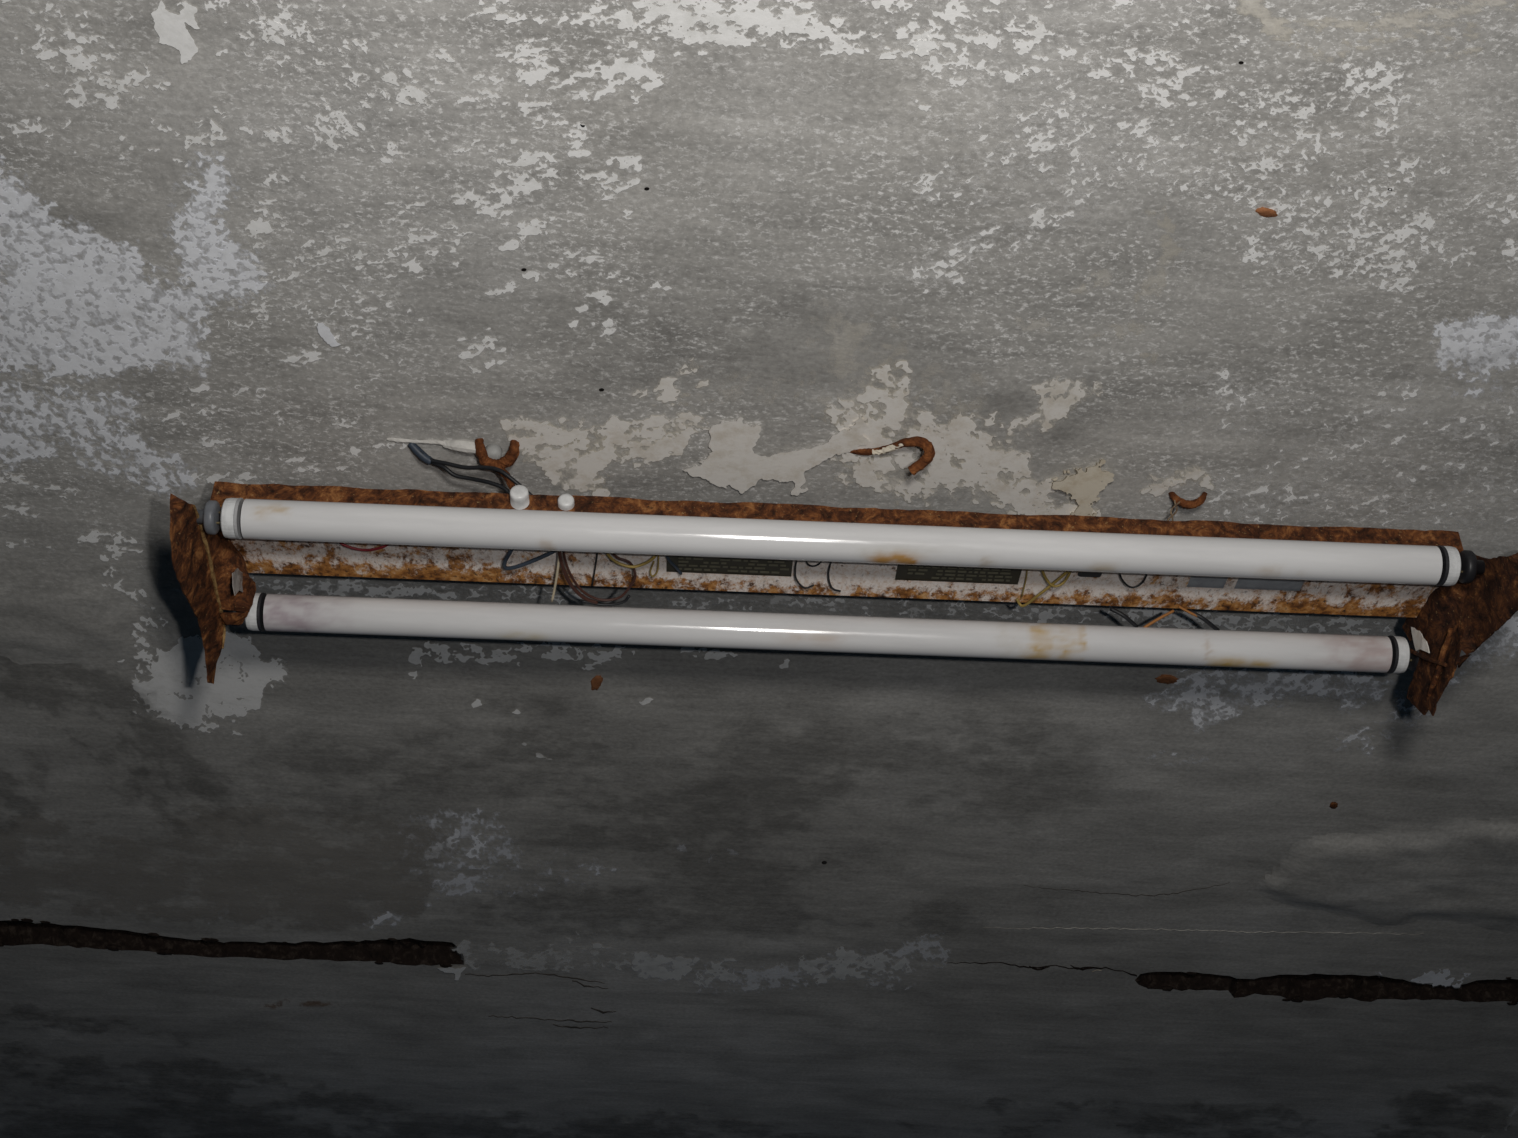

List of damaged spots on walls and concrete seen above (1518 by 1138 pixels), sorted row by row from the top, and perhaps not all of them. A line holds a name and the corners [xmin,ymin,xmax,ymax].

peeling [0,0,1476,518]
peeling [1462,185,1518,283]
peeling [77,530,143,560]
peeling [132,631,287,733]